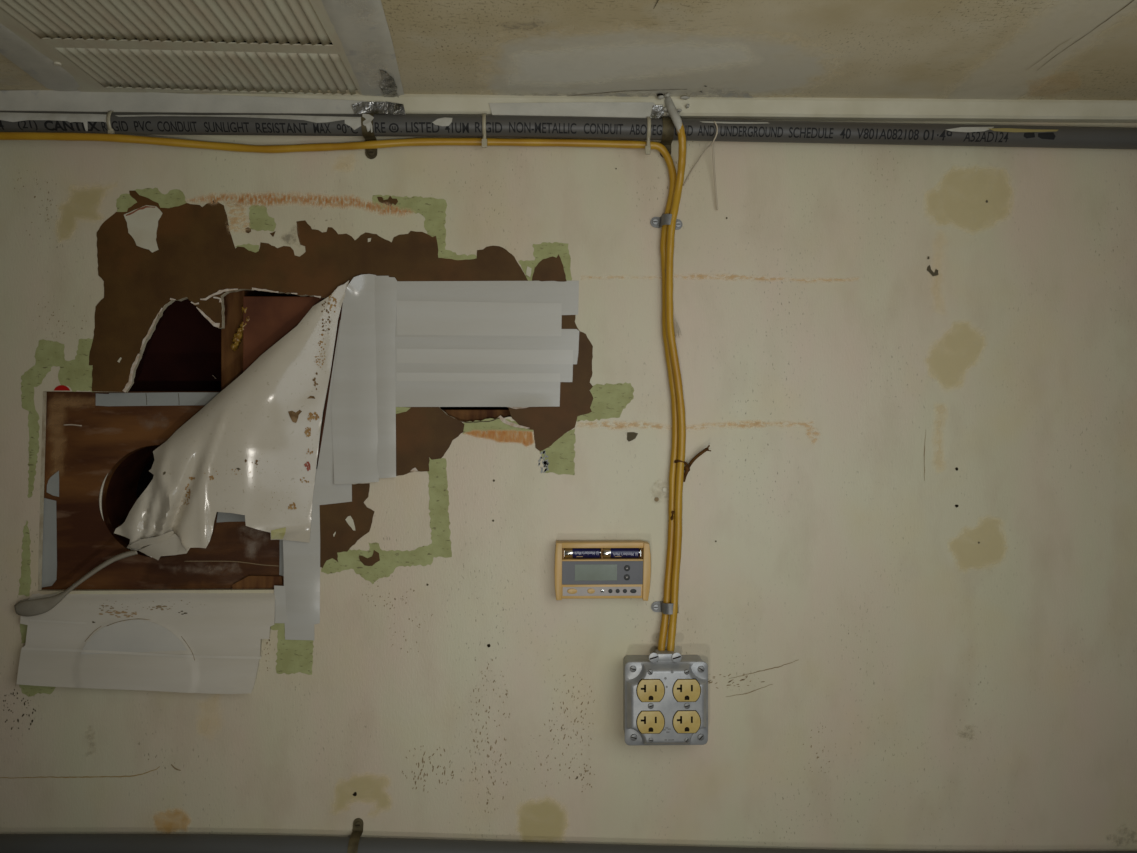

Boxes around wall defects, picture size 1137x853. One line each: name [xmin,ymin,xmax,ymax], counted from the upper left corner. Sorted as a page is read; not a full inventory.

leakage [929,170,1011,230]
peeling [21,188,572,498]
peeling [320,315,634,584]
peeling [18,521,31,597]
leakage [951,520,1004,568]
peeling [20,624,28,644]
peeling [270,623,314,675]
peeling [19,685,55,697]
leakage [336,776,390,810]
leakage [519,800,567,842]